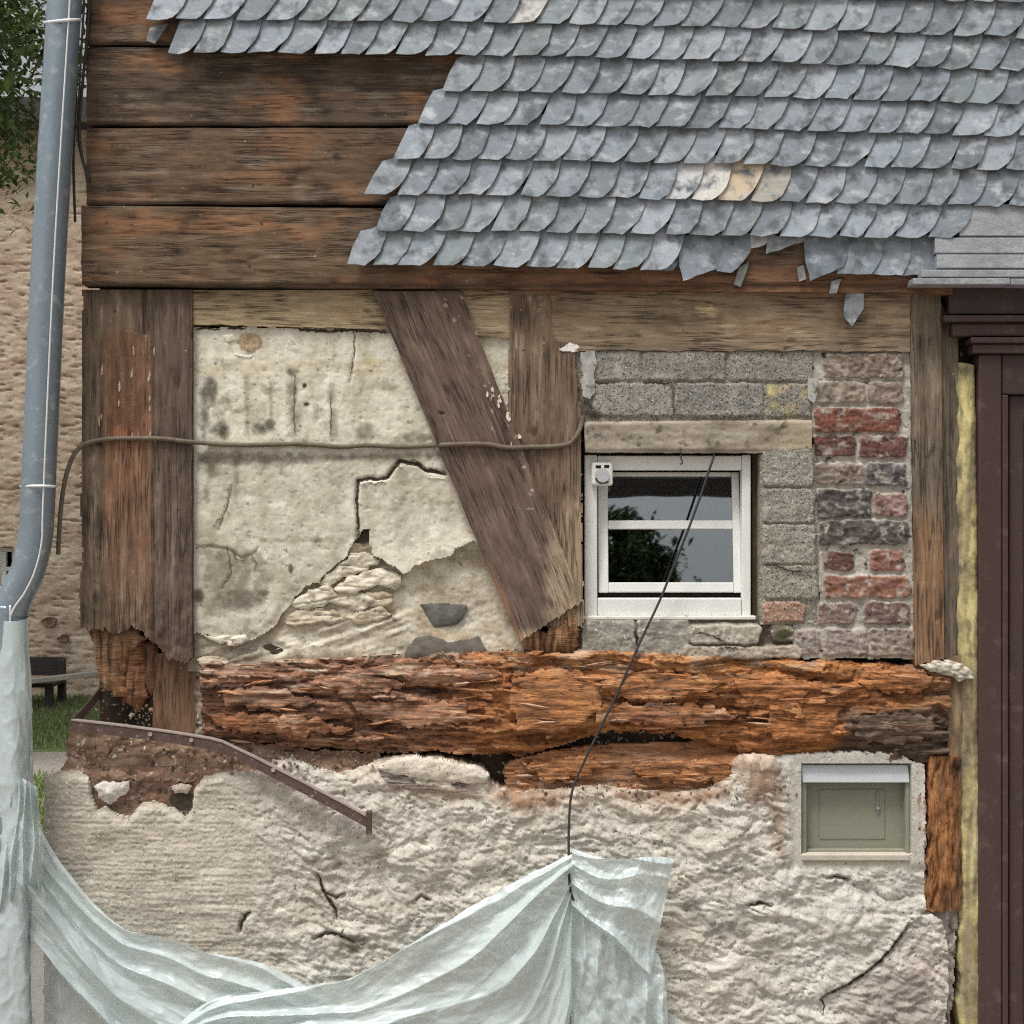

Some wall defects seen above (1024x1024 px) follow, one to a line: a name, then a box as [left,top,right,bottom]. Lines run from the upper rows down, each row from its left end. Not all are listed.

crack [196,324,244,332]
crack [291,327,387,435]
crack [198,488,258,587]
crack [355,459,446,537]
flaking render [188,529,524,672]
flaking render [90,765,200,816]
crack [313,874,354,942]
crack [821,925,909,1013]